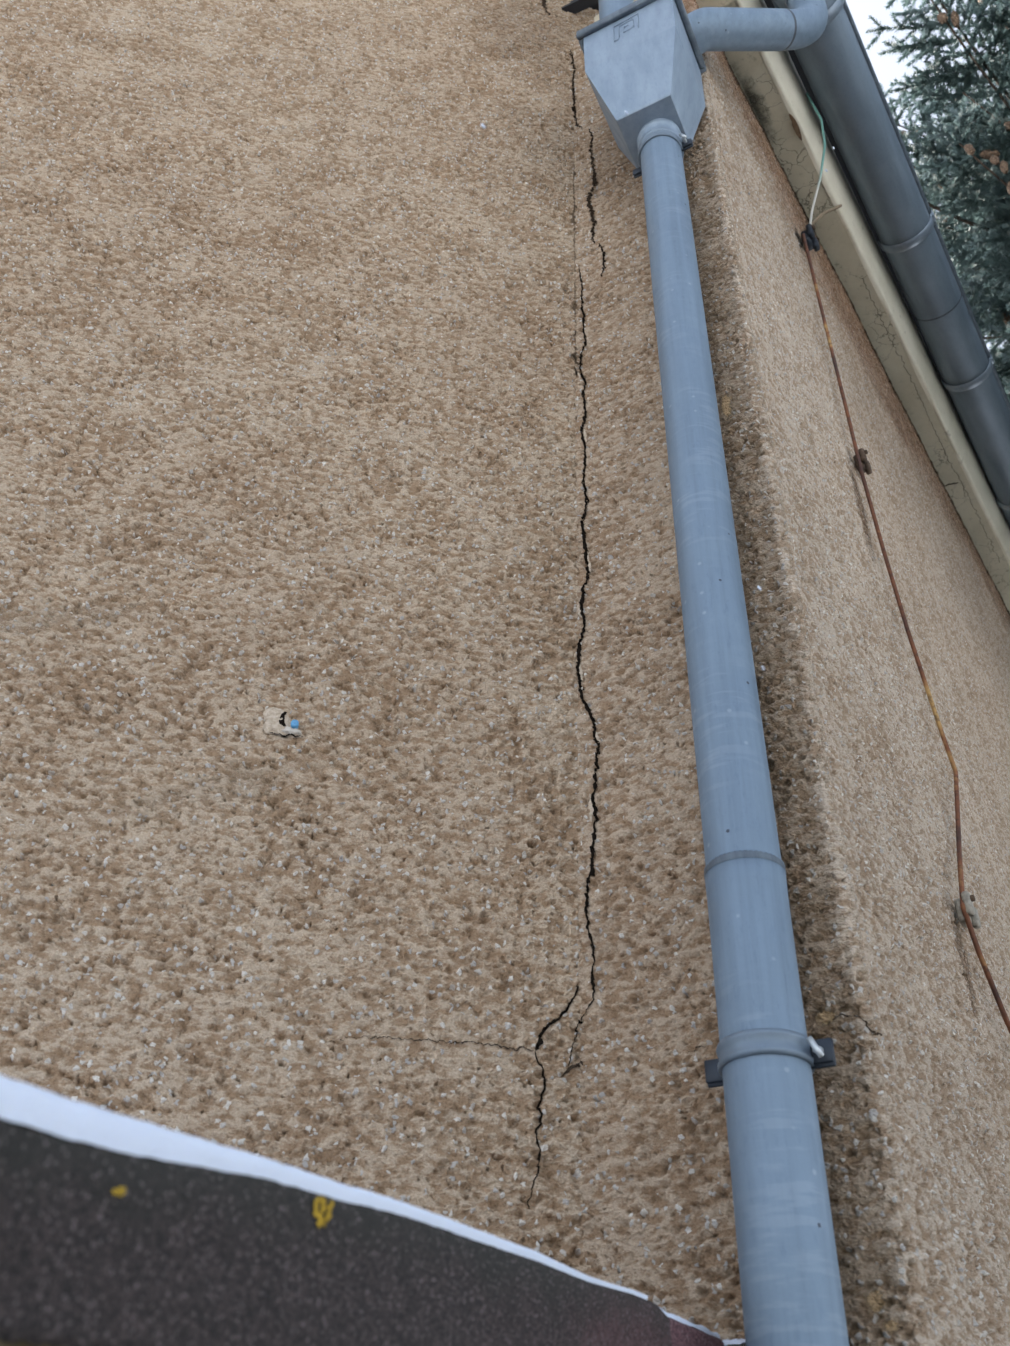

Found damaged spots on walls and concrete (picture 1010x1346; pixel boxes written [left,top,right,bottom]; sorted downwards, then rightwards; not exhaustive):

crack [329,49,606,1207]